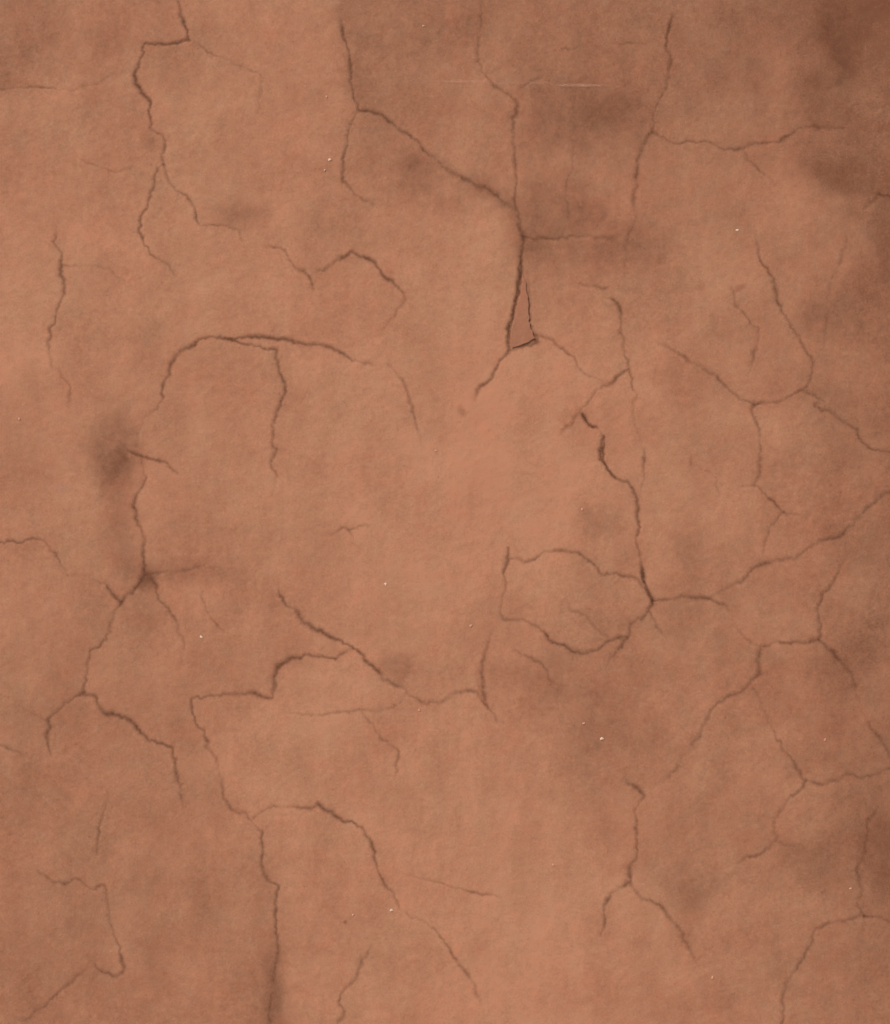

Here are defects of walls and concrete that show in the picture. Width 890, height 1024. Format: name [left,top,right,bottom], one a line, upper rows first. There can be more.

crack [507,255,535,348]